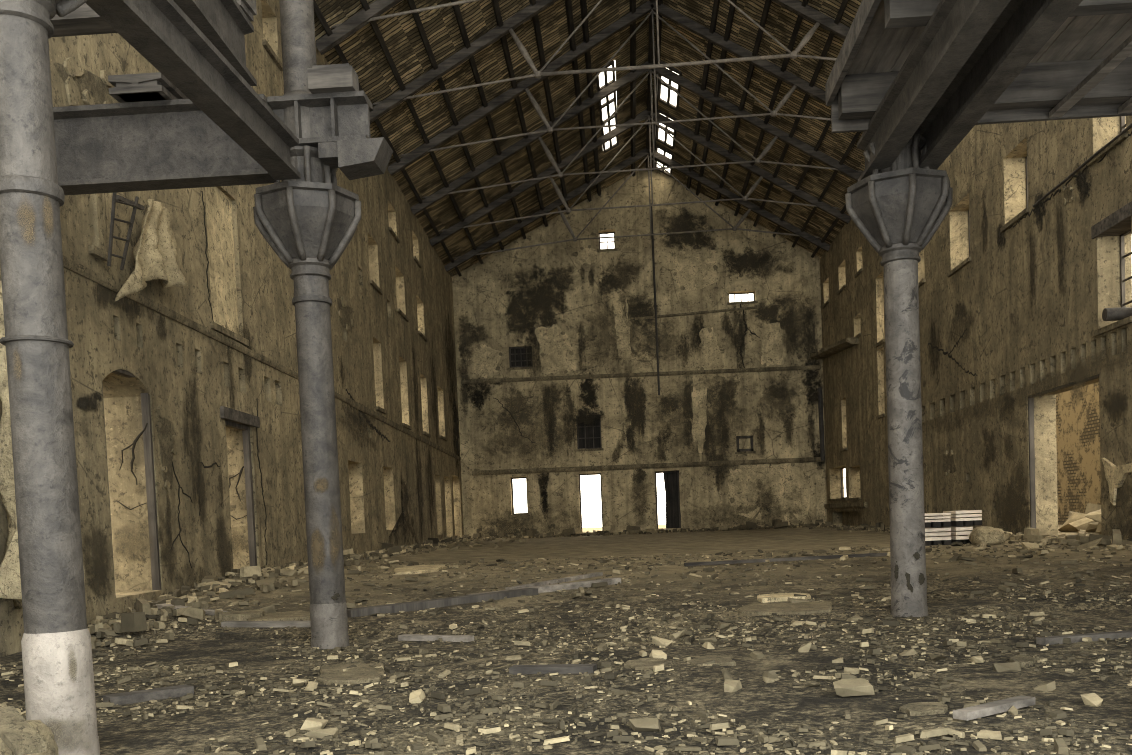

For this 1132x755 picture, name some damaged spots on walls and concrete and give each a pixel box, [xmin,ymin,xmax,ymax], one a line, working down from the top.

damp [502,259,704,375]
damp [722,294,818,368]
crack [117,423,148,510]
crack [170,399,267,567]
damp [484,384,580,536]
damp [632,469,647,525]
damp [612,374,798,491]
damp [808,415,826,470]
peeling [1101,458,1132,505]